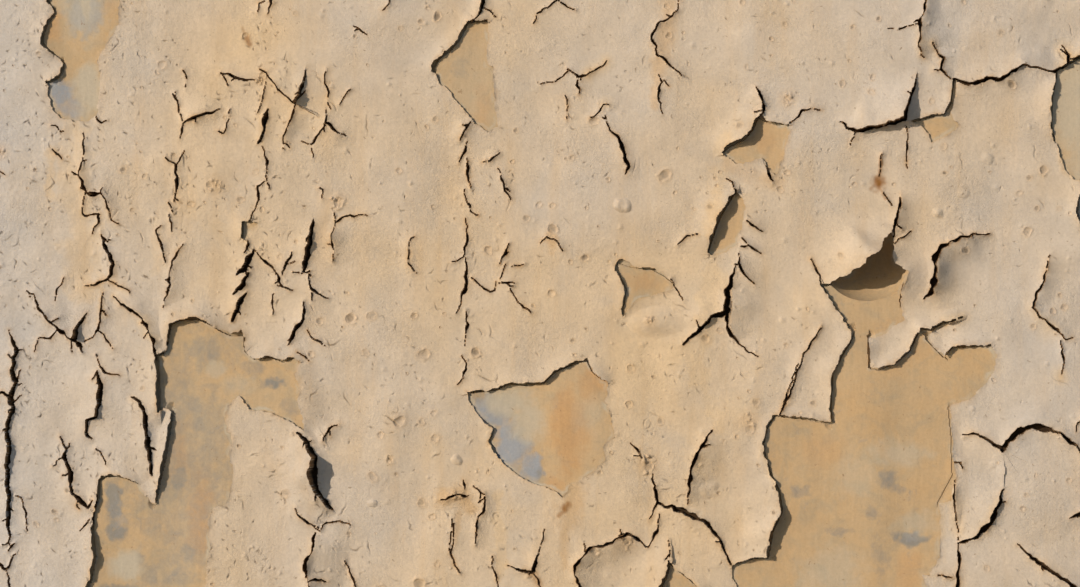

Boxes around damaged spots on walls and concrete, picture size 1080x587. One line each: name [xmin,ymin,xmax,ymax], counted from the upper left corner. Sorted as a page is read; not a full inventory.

peeling [33,0,120,122]
peeling [426,13,498,132]
crack [650,0,682,114]
peeling [717,106,791,175]
crack [451,120,531,385]
crack [0,68,368,587]
peeling [78,304,304,587]
peeling [466,350,614,497]
crack [573,429,732,587]
peeling [732,228,997,587]
crack [937,461,1006,587]
crack [962,412,1080,457]